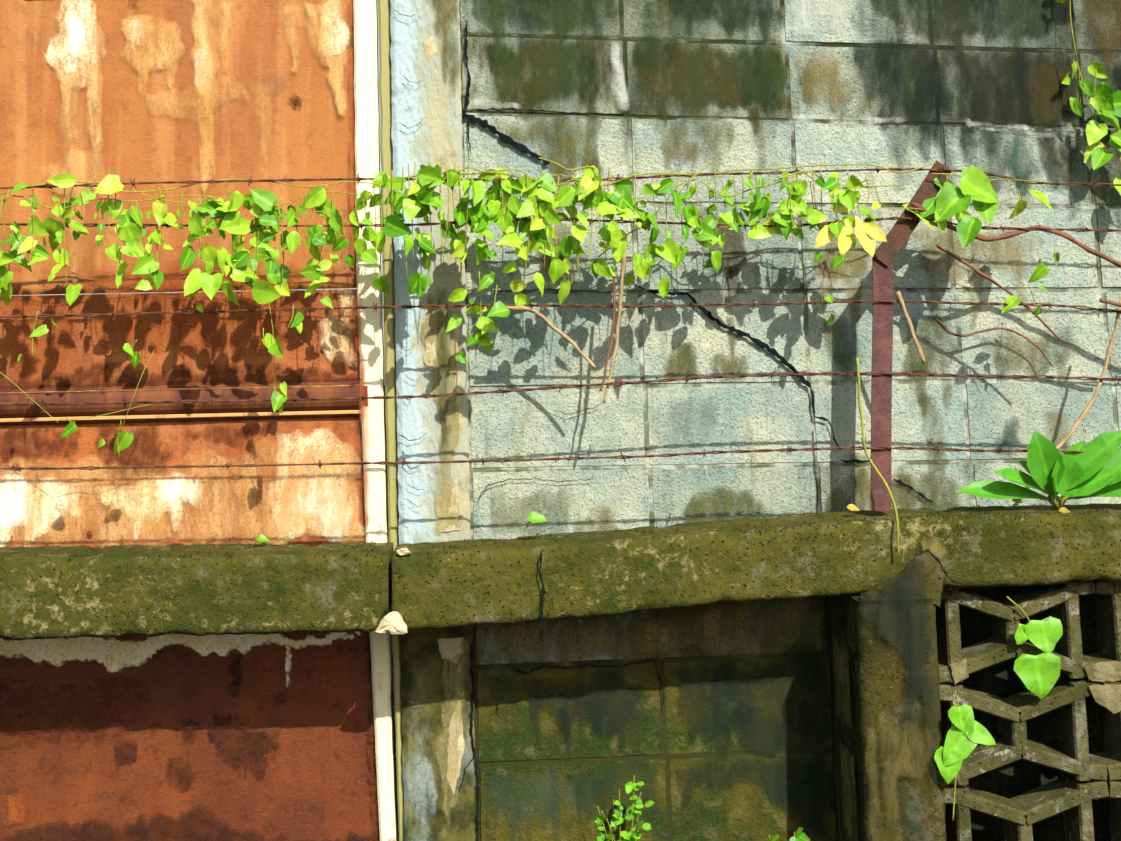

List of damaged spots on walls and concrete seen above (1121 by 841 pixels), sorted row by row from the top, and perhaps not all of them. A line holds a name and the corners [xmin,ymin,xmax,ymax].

crack [462,22,623,166]
damp [472,0,627,191]
damp [634,0,787,132]
damp [855,0,1073,201]
rust [0,264,367,421]
crack [490,282,869,464]
rust [97,422,169,480]
crack [893,479,934,504]
peeling [0,632,360,680]
rust [337,636,397,841]
spalling [1084,661,1121,714]
rust [6,801,287,841]